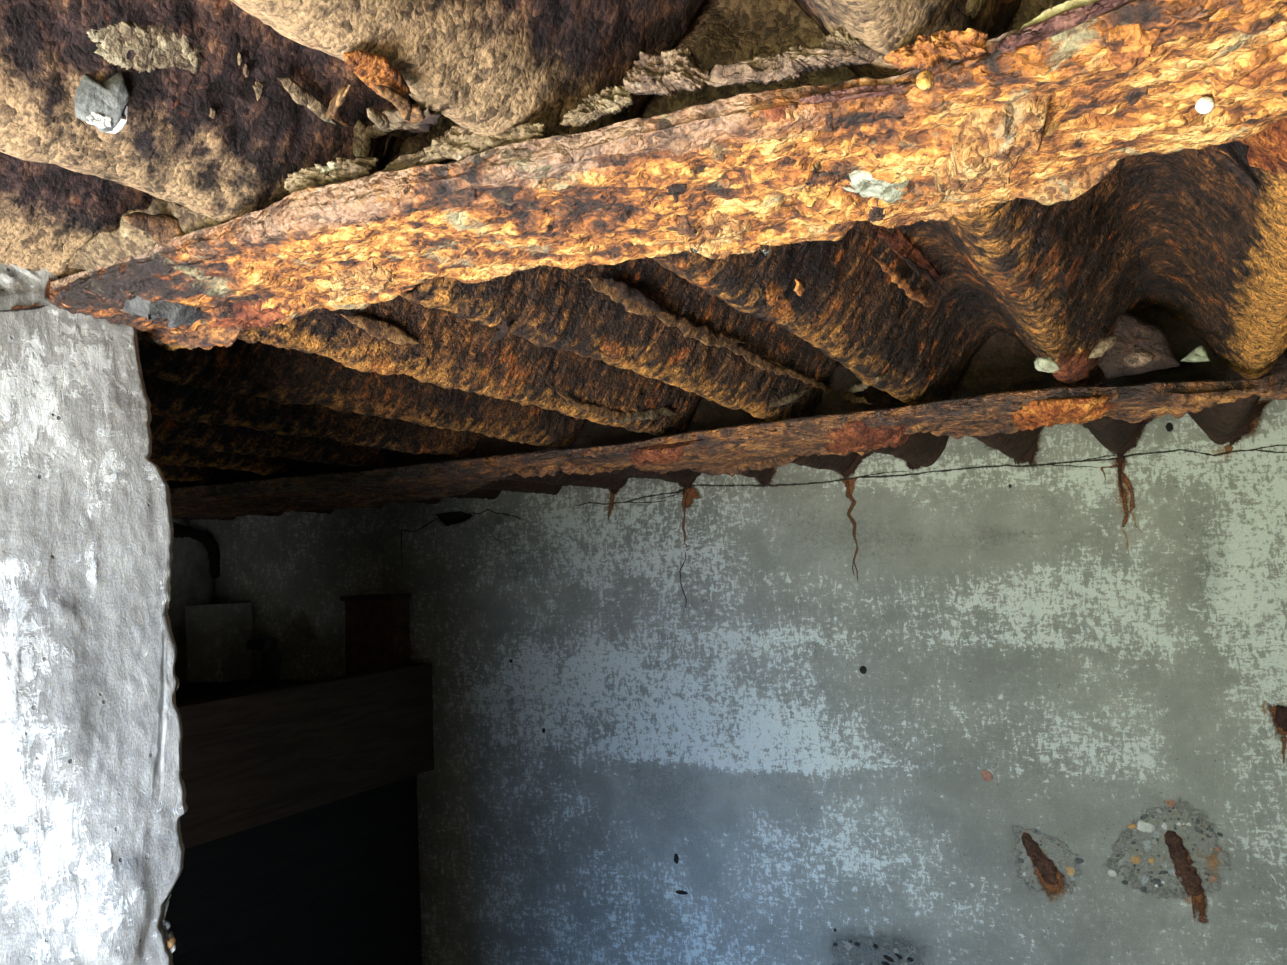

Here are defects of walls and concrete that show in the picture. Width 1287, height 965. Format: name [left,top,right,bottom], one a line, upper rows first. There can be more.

rust [1125,85,1148,106]
rust [590,153,628,168]
rust [867,198,885,222]
rust [762,280,795,321]
rust [1052,348,1097,384]
rust [1218,399,1271,454]
rust [1101,416,1155,548]
rust [678,472,702,612]
rust [1262,701,1287,764]
spalling [1013,826,1084,896]
spalling [1106,799,1230,923]
spalling [832,928,923,965]